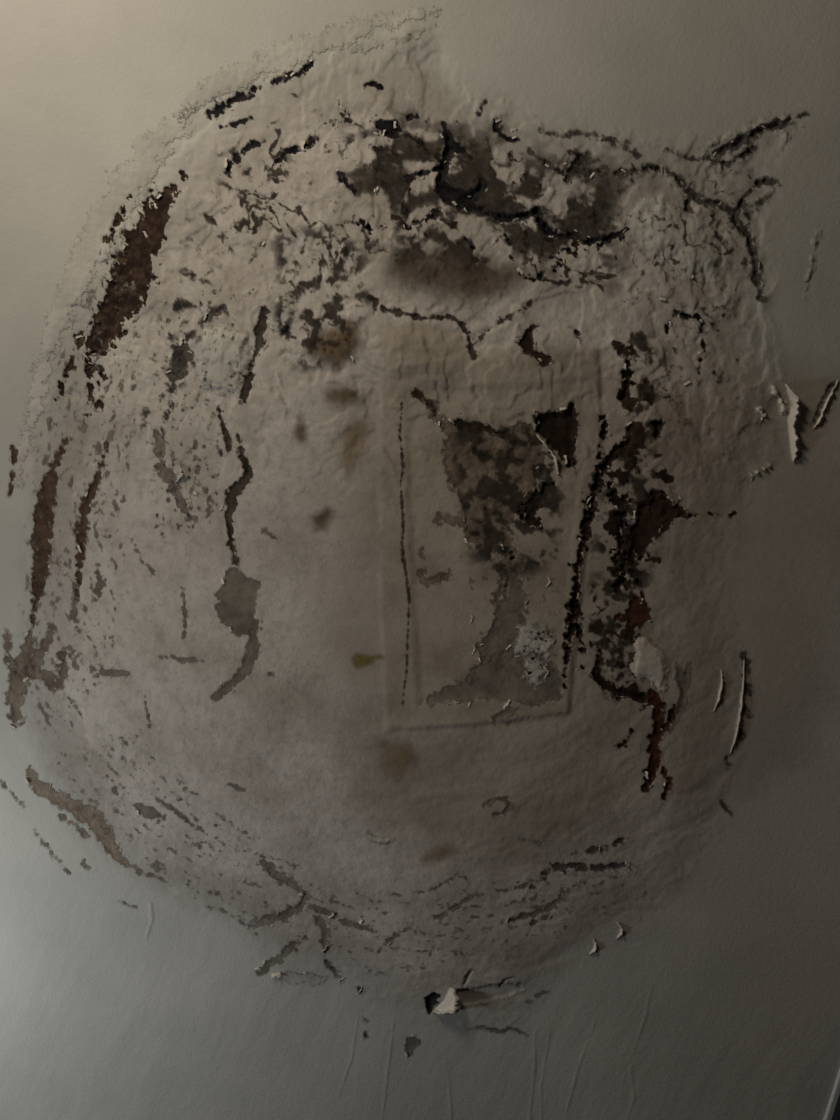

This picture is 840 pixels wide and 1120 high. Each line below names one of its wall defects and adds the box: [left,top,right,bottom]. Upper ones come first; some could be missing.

water stain [346,122,619,296]
crack [233,112,809,375]
crack [218,305,271,566]
peeling [2,56,774,1015]
crack [398,402,410,704]
water stain [456,423,569,573]
crack [562,360,665,705]
water stain [590,383,659,682]
corrosion [613,593,652,626]
peeling [770,384,800,462]
peeling [813,379,839,429]
corrosion [641,689,676,800]